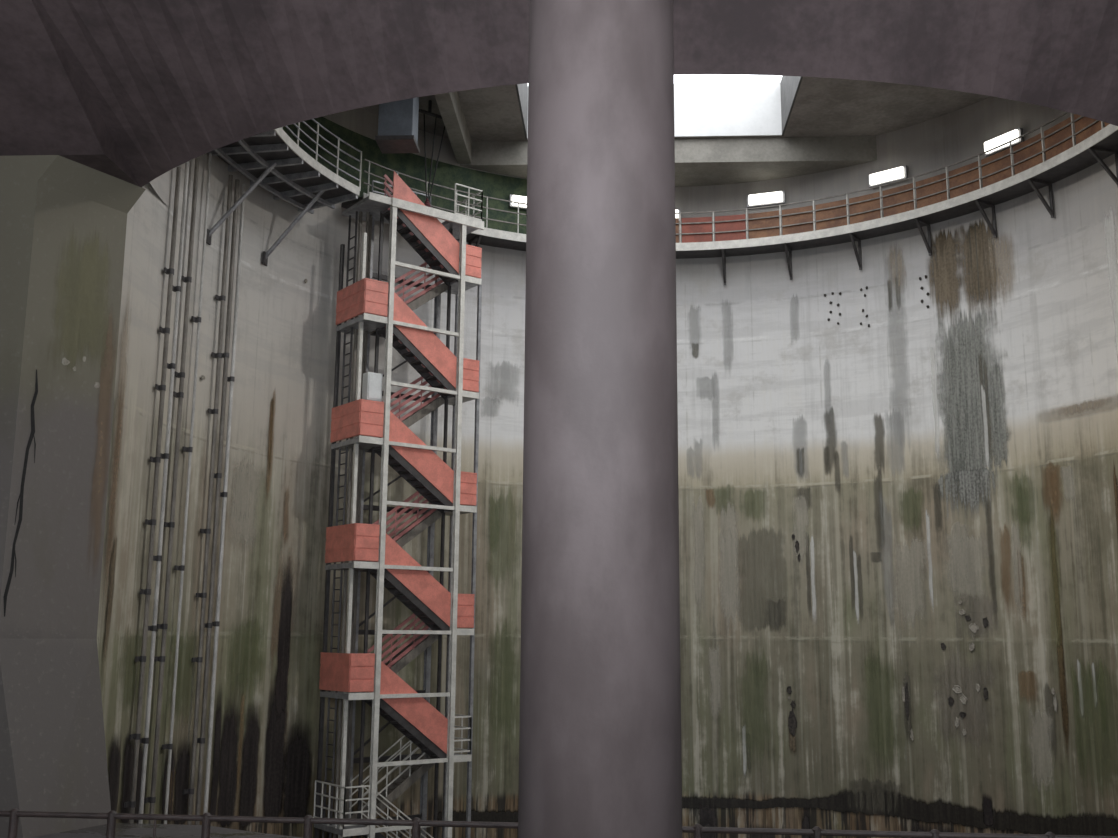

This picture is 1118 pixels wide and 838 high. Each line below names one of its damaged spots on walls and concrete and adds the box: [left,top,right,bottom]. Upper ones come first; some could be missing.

leakage [888,250,903,309]
crack [3,370,38,617]
leakage [210,567,312,829]
leakage [694,489,784,630]
leakage [795,449,816,616]
leakage [849,416,884,617]
leakage [898,220,1011,623]
rust [1044,463,1074,748]
leakage [682,778,1118,838]